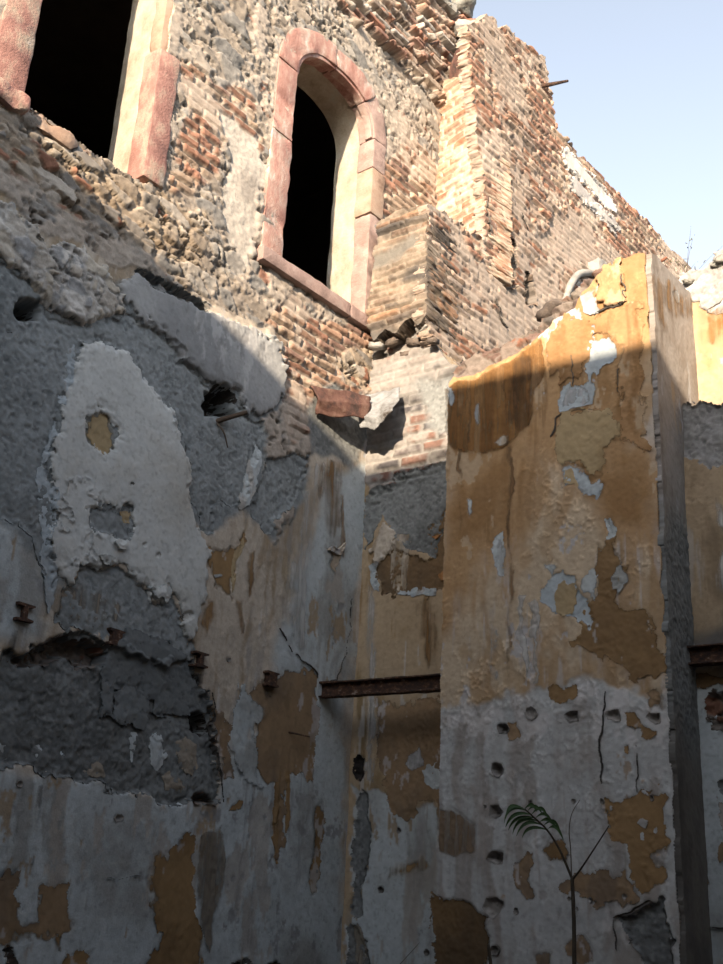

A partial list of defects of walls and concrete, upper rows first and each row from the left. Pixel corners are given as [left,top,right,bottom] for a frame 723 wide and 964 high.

leakage [445,339,546,453]
peeling [546,257,652,500]
flaking render [682,400,723,470]
flaking render [0,200,321,864]
peeling [540,518,667,708]
peeling [375,695,475,857]
crack [598,691,606,784]
peeling [0,868,90,964]
peeling [146,829,226,964]
flaking render [346,754,372,964]
peeling [429,891,490,964]
peeling [558,784,676,964]